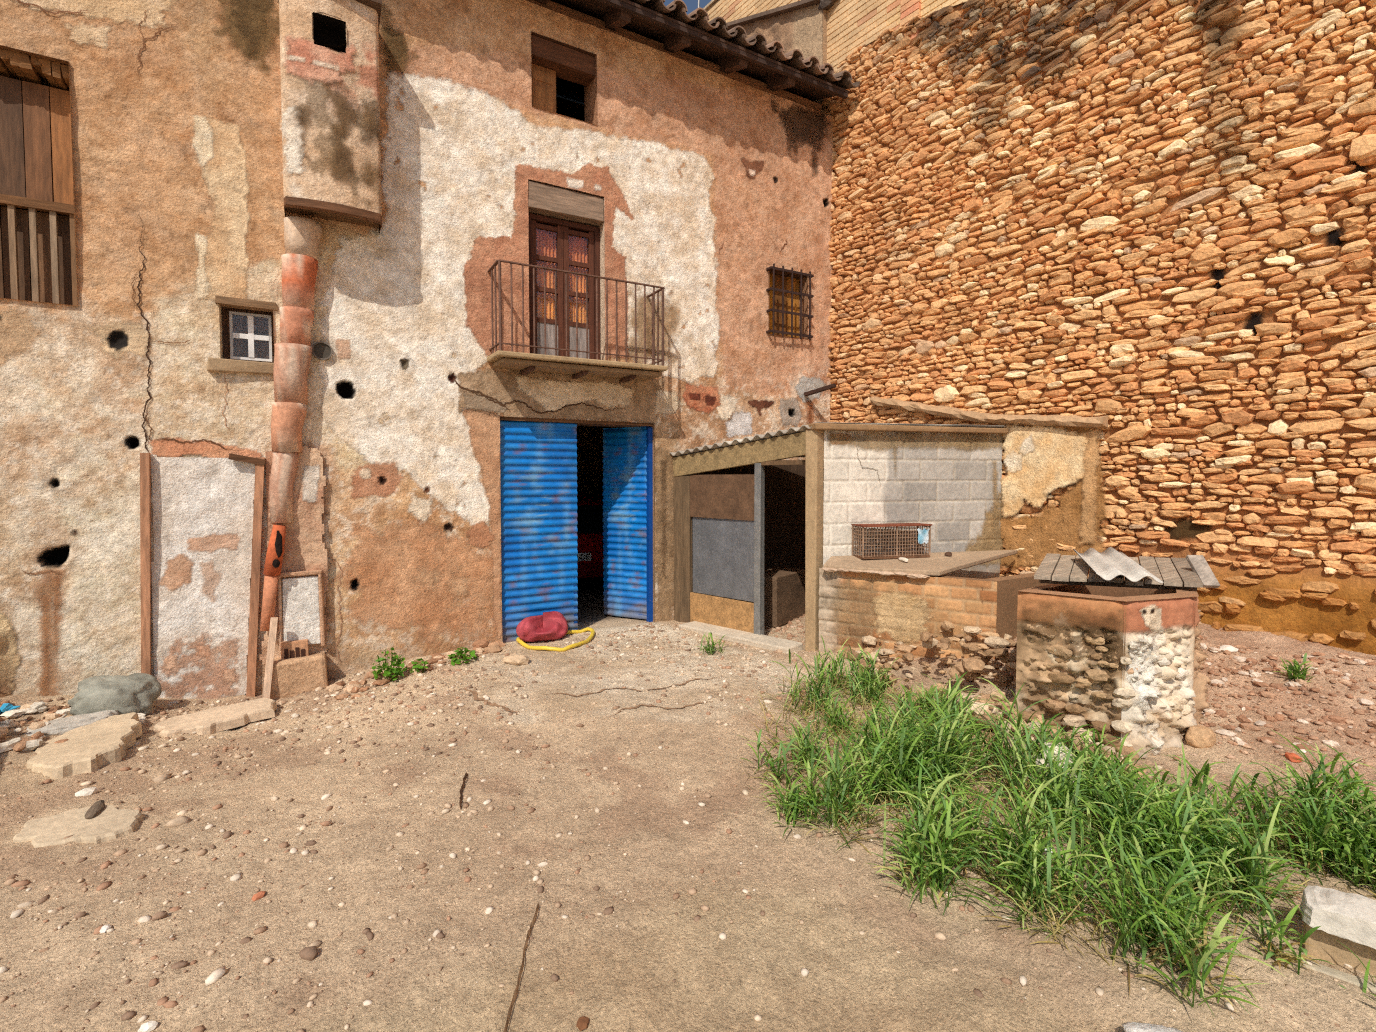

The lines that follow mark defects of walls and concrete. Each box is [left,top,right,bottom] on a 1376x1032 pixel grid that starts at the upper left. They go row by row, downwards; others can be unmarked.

crack [137,10,178,75]
damp [216,0,280,71]
damp [382,6,409,71]
damp [296,104,312,125]
damp [324,83,379,183]
damp [772,101,827,174]
crack [131,216,190,453]
peeling [319,71,795,665]
peeling [1001,425,1100,517]
damp [43,578,58,692]